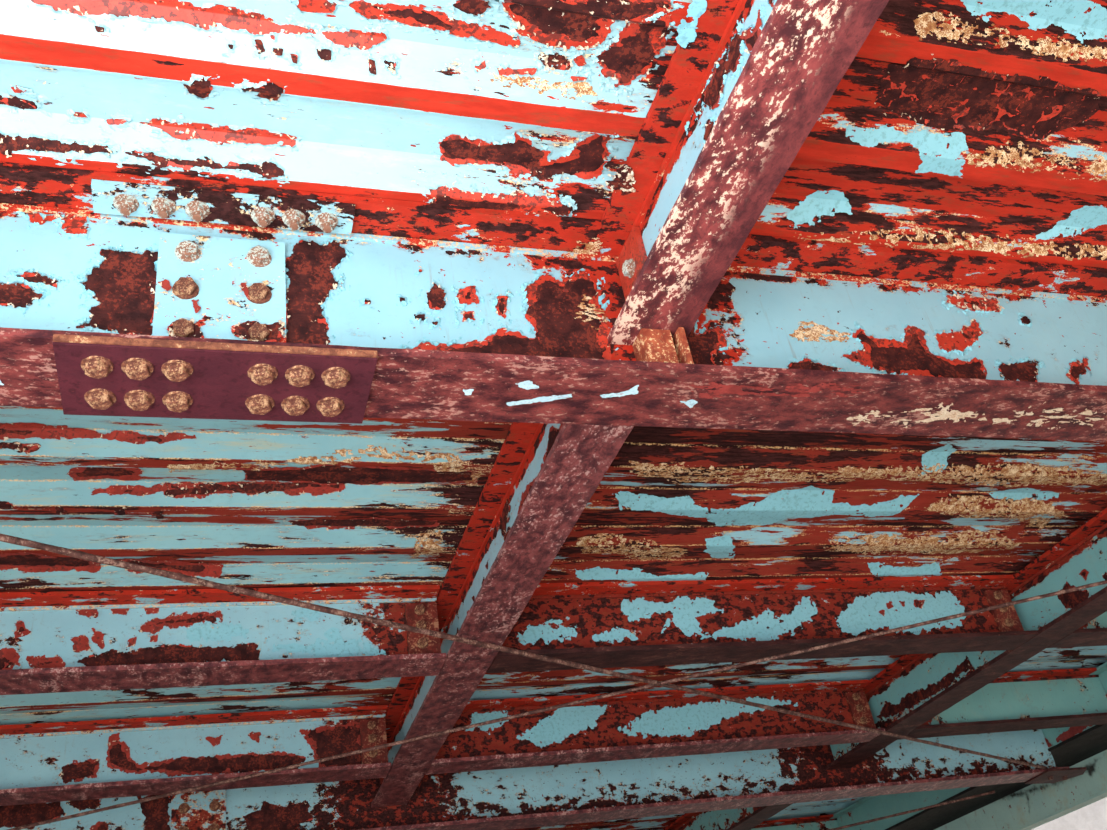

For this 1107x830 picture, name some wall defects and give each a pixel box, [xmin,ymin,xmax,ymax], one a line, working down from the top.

peeling [24,0,707,103]
rust [914,12,1107,63]
peeling [961,0,1107,46]
rust [0,131,290,187]
peeling [422,132,620,217]
rust [875,54,1107,182]
rust [0,241,159,335]
rust [231,237,375,345]
peeling [386,268,621,360]
peeling [841,290,1005,380]
peeling [66,464,478,499]
rust [77,642,261,666]